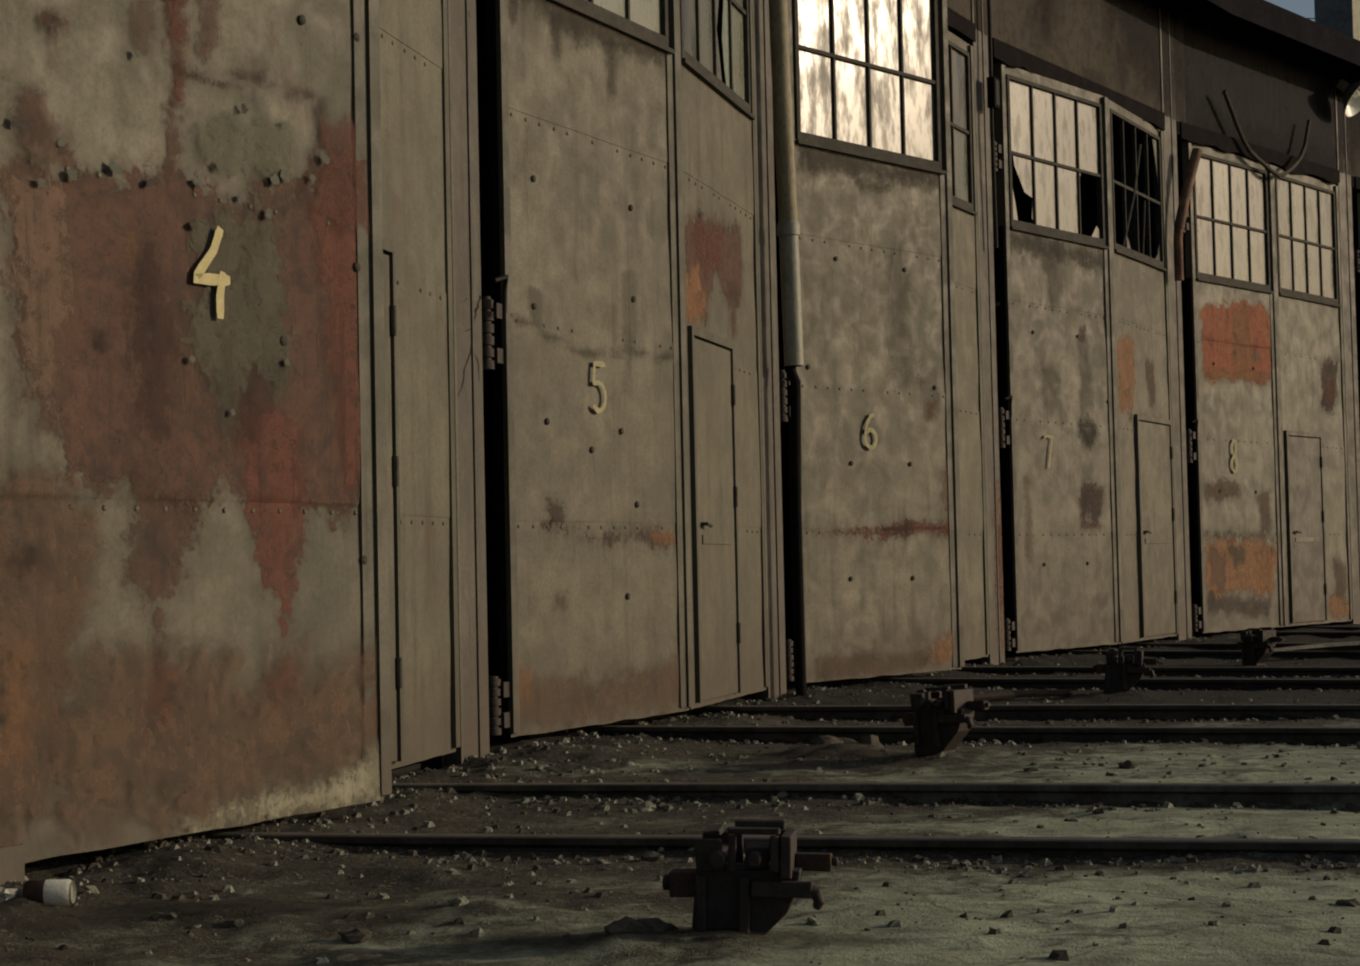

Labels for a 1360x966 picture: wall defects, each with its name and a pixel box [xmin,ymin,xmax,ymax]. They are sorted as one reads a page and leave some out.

rust [685,211,744,335]
rust [0,0,360,677]
rust [839,470,949,542]
rust [1205,480,1239,502]
rust [1204,494,1277,601]